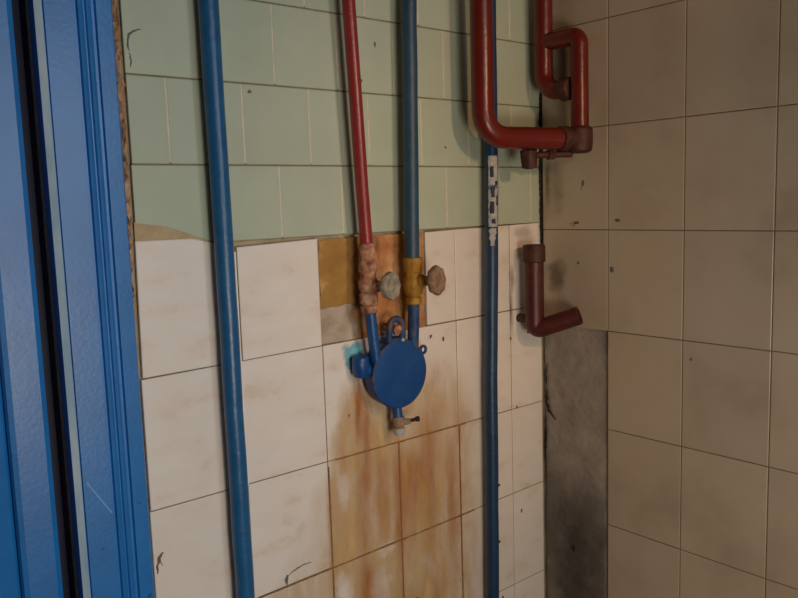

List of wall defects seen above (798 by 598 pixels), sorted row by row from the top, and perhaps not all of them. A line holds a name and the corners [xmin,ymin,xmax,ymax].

spalling [126,203,213,261]
rust [351,237,367,339]
rust [372,234,408,335]
rust [260,388,475,598]
spalling [545,327,608,598]